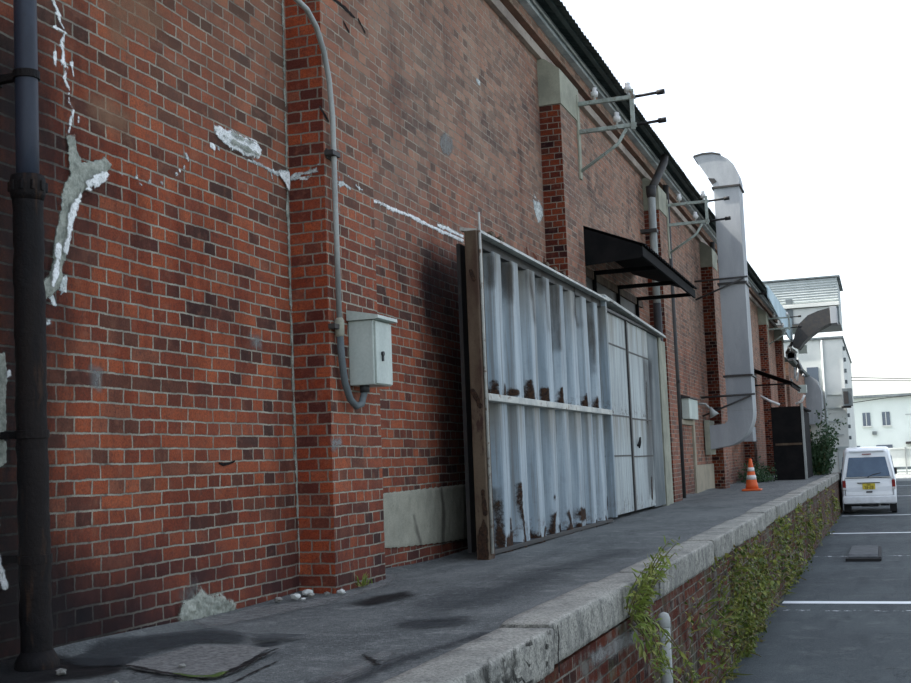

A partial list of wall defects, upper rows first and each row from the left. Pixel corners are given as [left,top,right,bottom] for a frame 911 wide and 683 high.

peeling [49,275,67,306]
rust [470,380,564,408]
rust [580,393,599,408]
rust [477,482,608,560]
peeling [0,558,8,590]